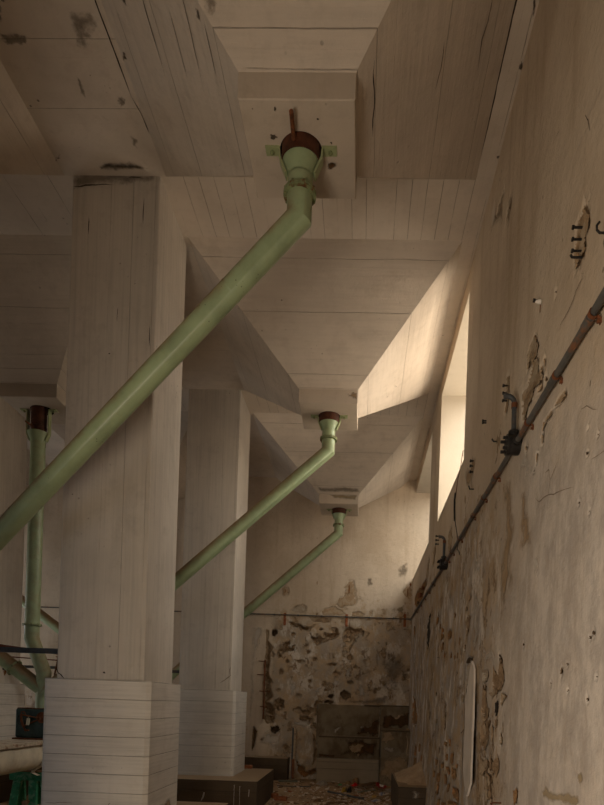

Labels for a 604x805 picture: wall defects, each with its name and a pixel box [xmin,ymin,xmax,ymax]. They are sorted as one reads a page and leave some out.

crack [481,0,517,154]
peeling [522,335,548,420]
flaking render [257,621,367,734]
flaking render [293,663,353,765]
flaking render [429,595,507,805]